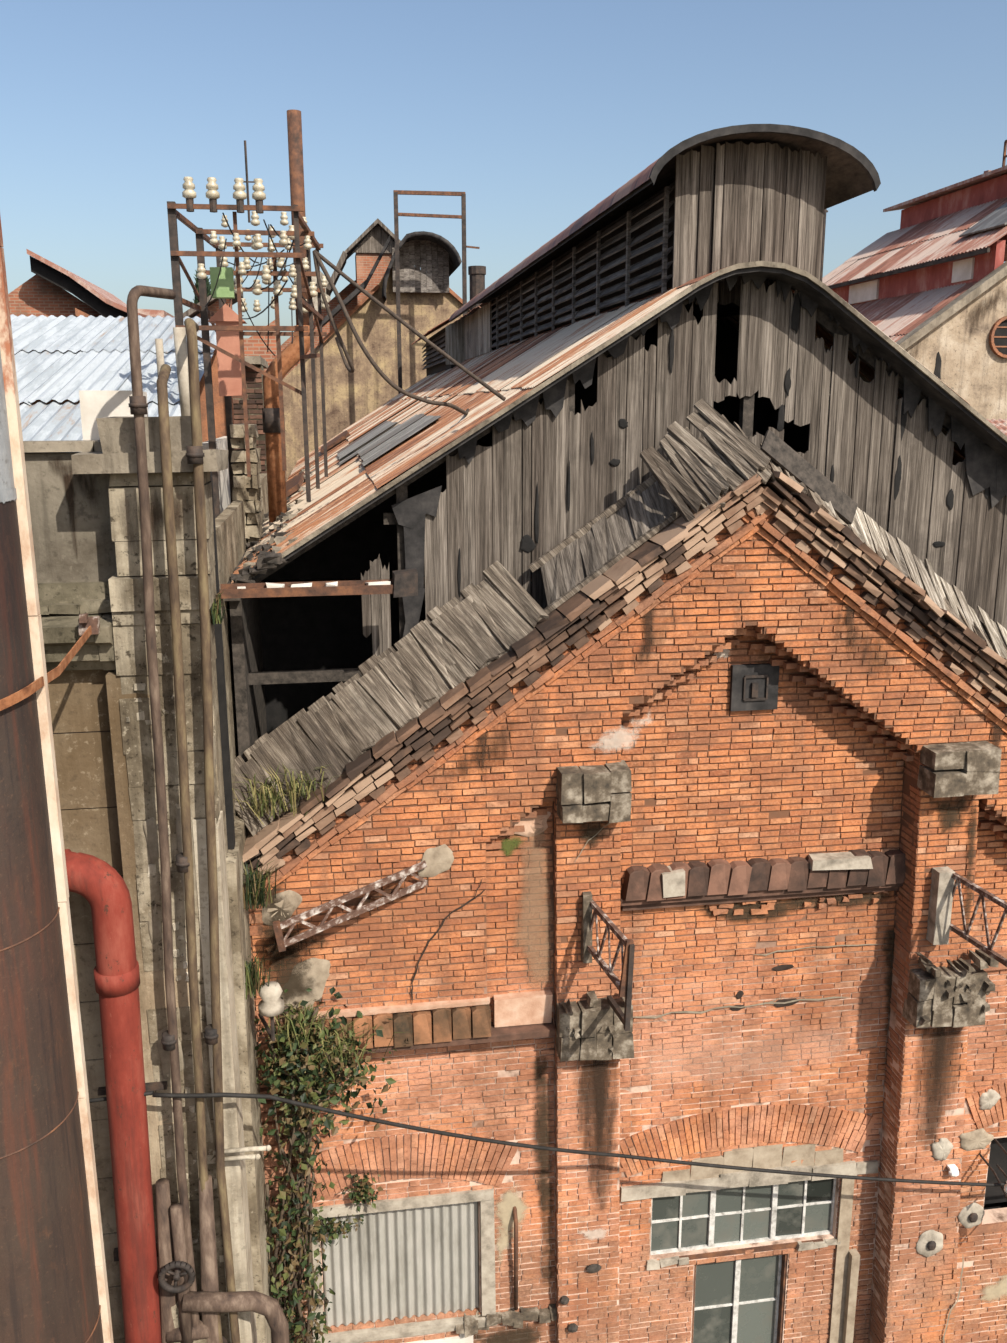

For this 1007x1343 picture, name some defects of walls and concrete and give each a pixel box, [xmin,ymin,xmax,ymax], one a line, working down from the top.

crack [411,880,486,1005]
water stain [580,1060,616,1199]
water stain [919,1026,962,1141]